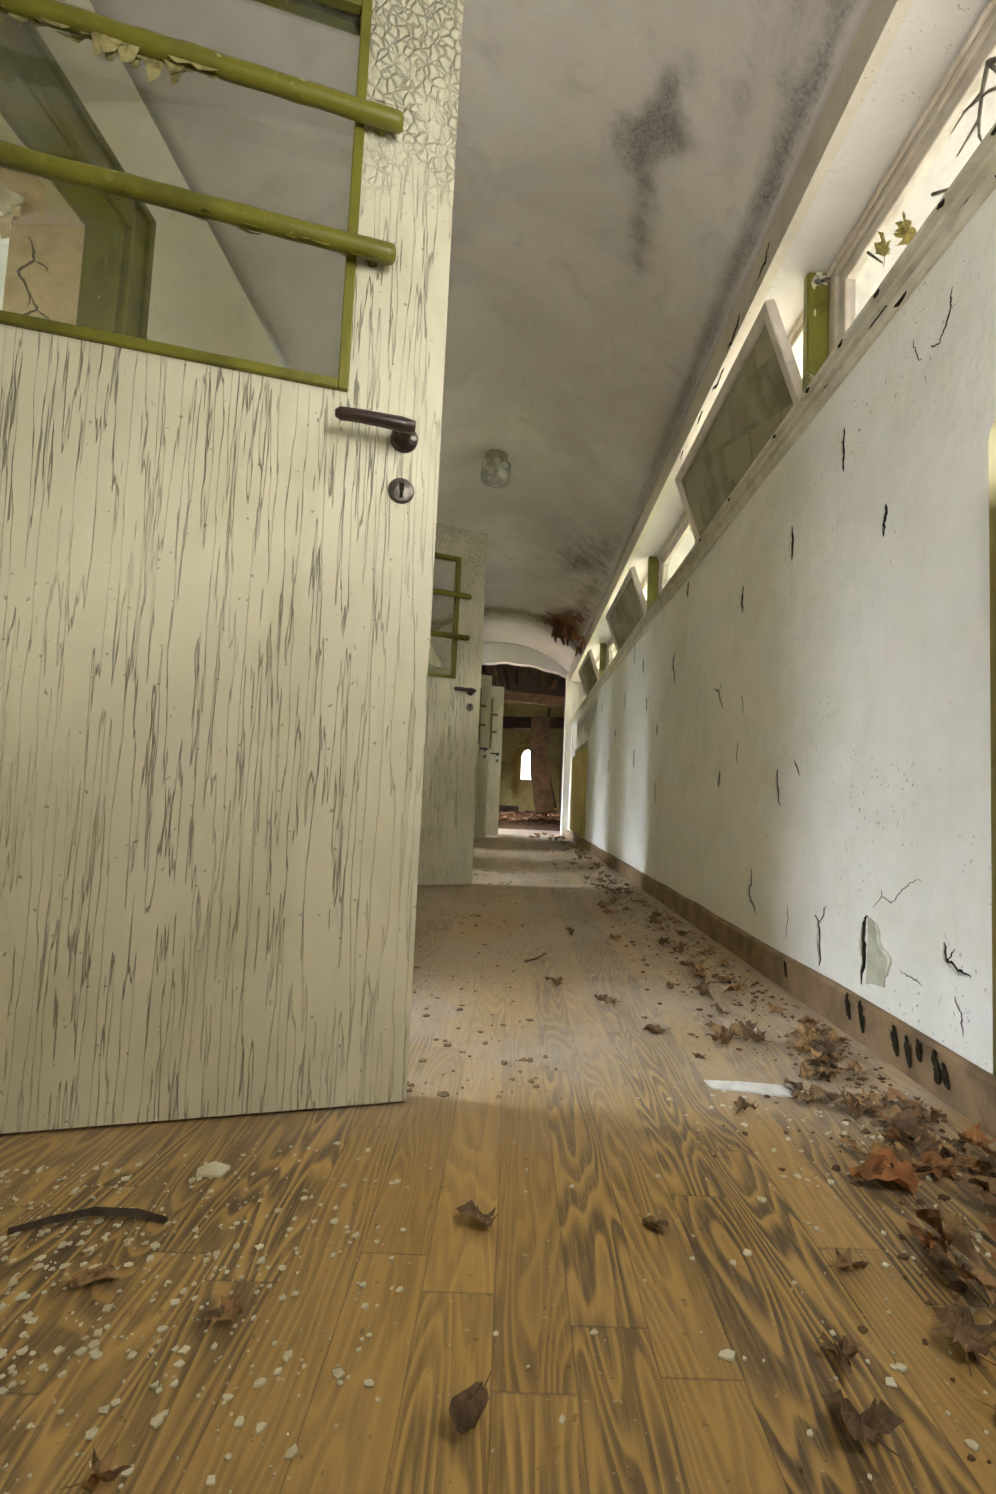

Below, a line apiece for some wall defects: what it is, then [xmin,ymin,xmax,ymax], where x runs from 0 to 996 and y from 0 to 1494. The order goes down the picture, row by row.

crack [913,287,953,361]